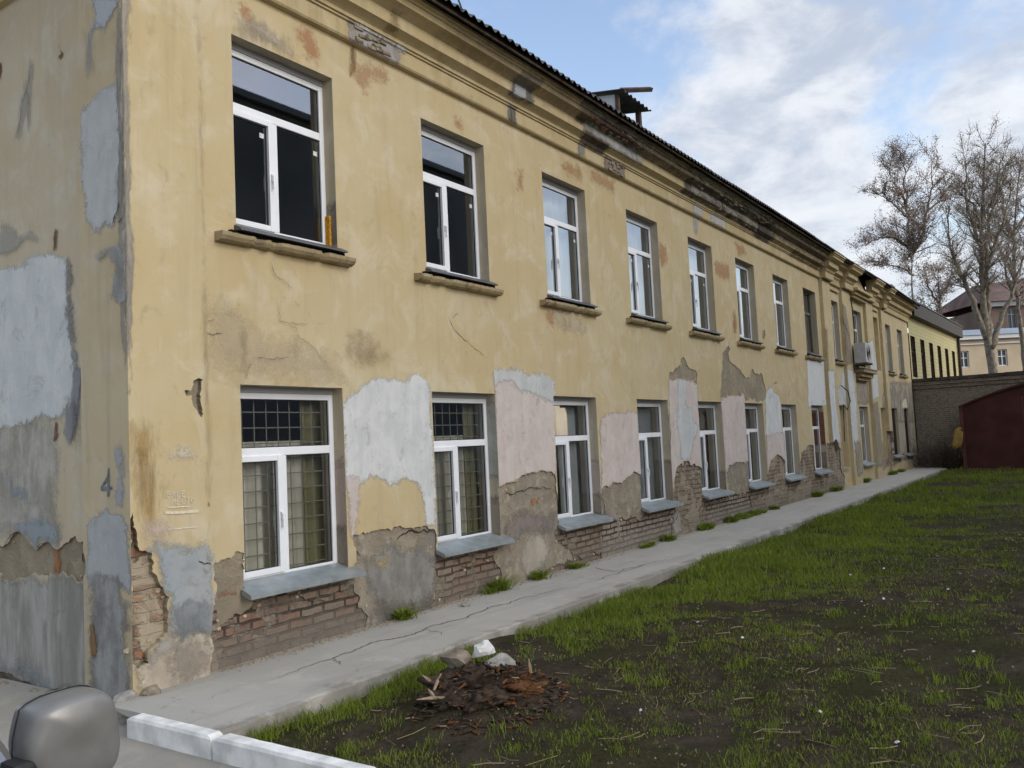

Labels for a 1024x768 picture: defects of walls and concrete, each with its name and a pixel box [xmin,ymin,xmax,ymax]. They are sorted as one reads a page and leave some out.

spalling [354,24,391,57]
peeling [79,0,134,356]
peeling [65,261,81,381]
crack [246,263,325,377]
flaking render [669,357,697,384]
flaking render [719,346,766,403]
spalling [123,514,170,670]
flaking render [210,411,845,672]